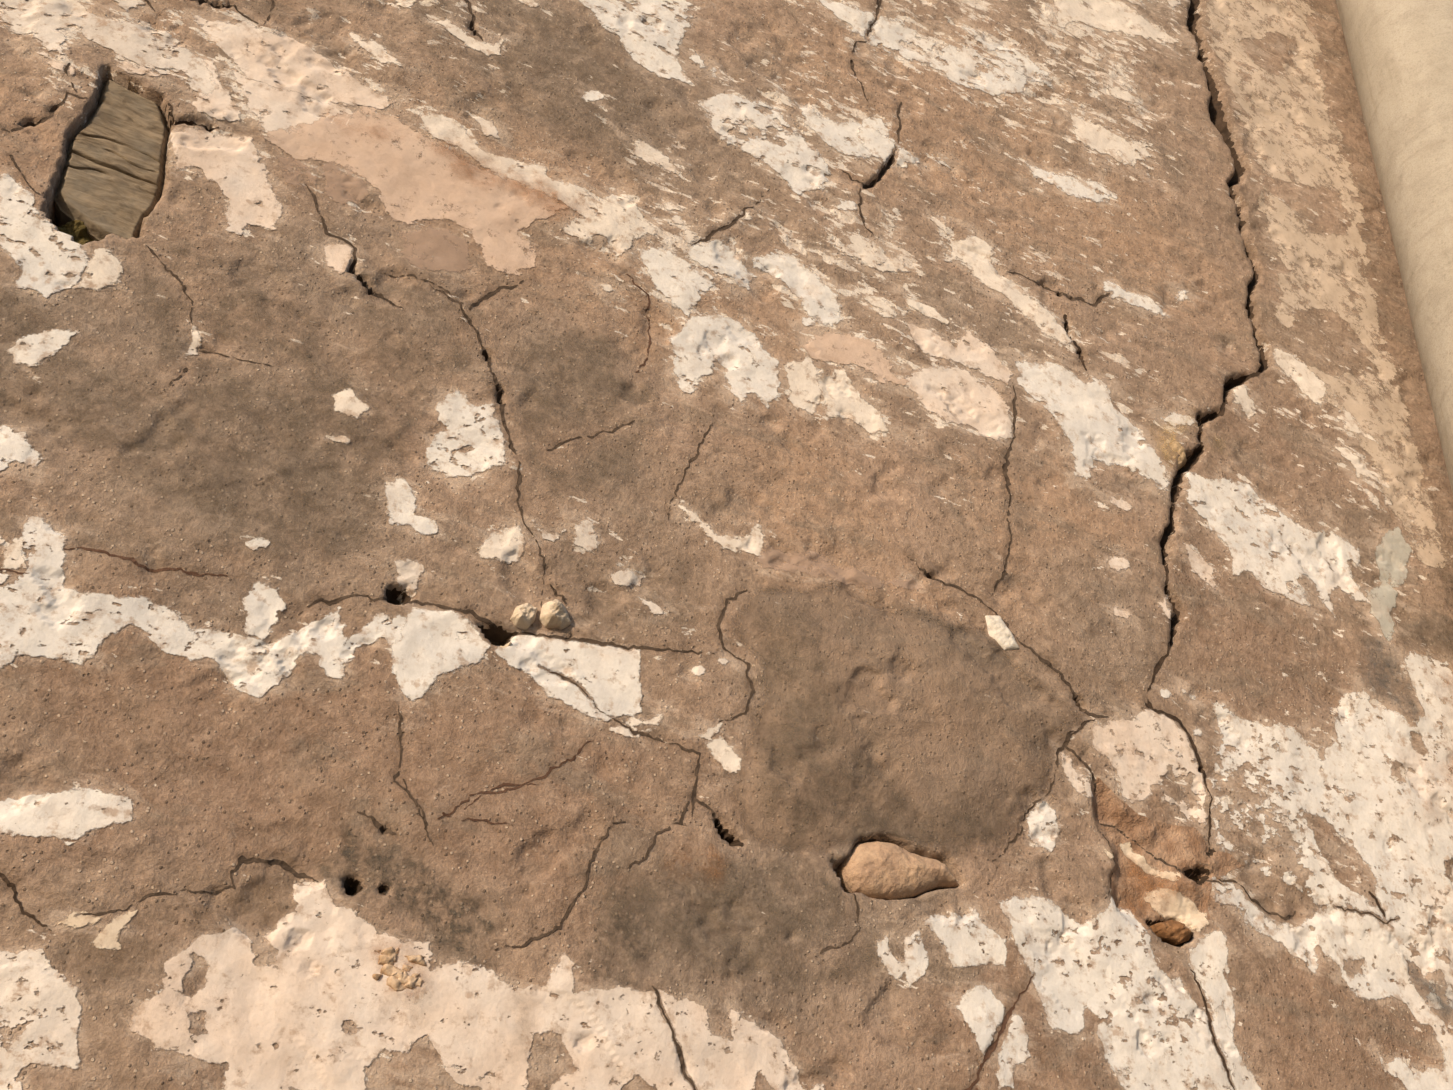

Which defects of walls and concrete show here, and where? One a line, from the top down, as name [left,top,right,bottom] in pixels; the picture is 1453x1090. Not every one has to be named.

crack [842,0,902,235]
peeling [0,0,1450,641]
peeling [0,515,667,738]
crack [290,185,755,950]
peeling [691,658,731,676]
peeling [700,722,741,773]
crack [907,0,1296,920]
crack [0,872,52,931]
crack [83,855,318,916]
peeling [128,879,824,1090]
peeling [877,649,1453,1090]
crack [1337,891,1397,924]